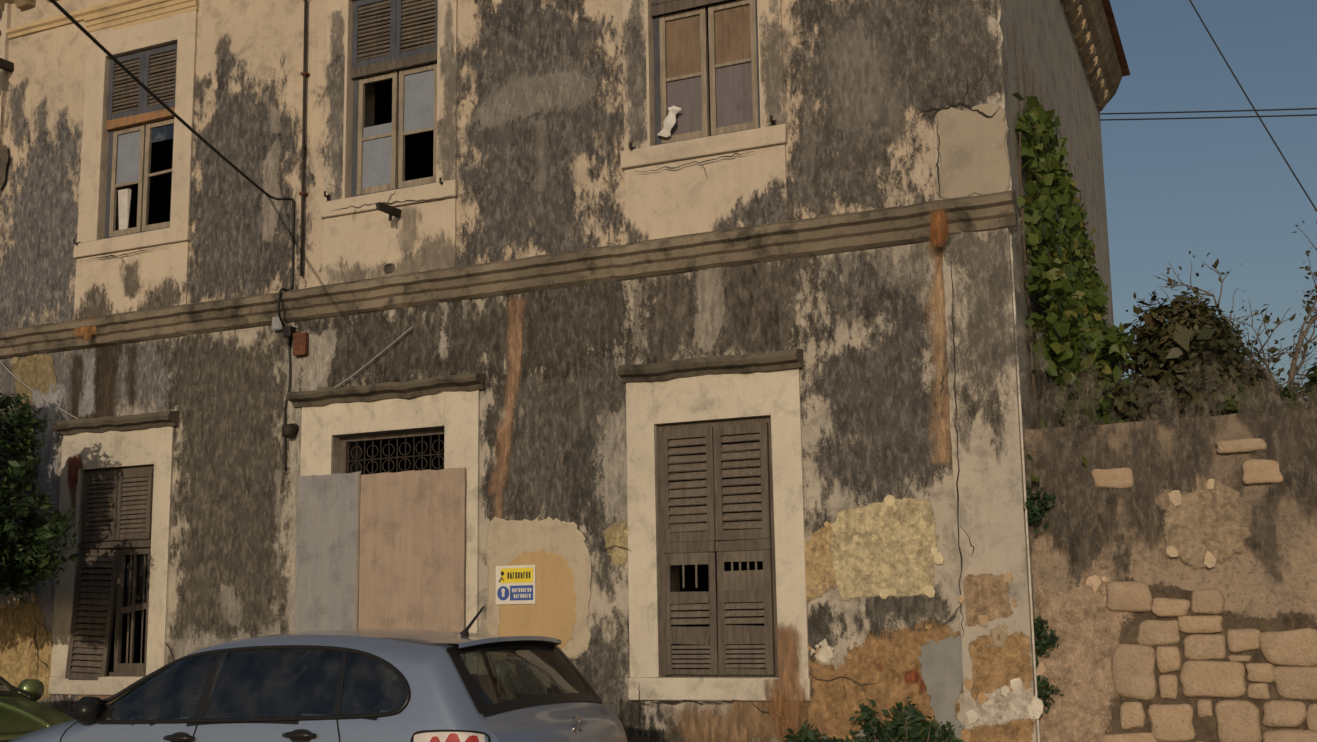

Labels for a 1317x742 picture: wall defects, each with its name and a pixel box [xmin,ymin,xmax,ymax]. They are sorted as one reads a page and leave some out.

mould [0,10,345,331]
water stain [320,0,648,282]
crack [633,151,754,177]
water stain [713,0,1014,231]
peeling [0,592,113,701]
corrosion [488,297,526,519]
water stain [0,216,1317,742]
peeling [804,495,944,602]
corrosion [928,209,952,463]
crack [940,250,975,637]
spalling [954,554,1317,742]
peeling [1154,476,1251,570]